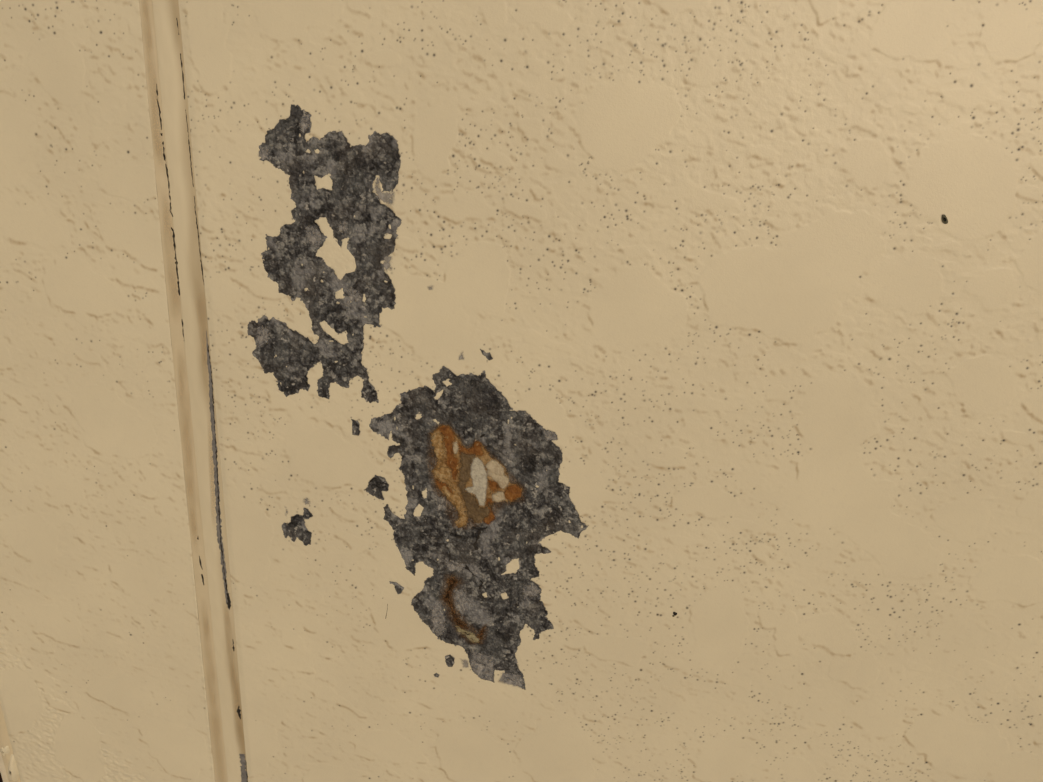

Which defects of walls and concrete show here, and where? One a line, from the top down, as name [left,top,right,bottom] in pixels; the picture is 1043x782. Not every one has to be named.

peeling [248,104,588,689]
rust [436,425,484,493]
rust [483,480,522,525]
rust [443,578,485,643]